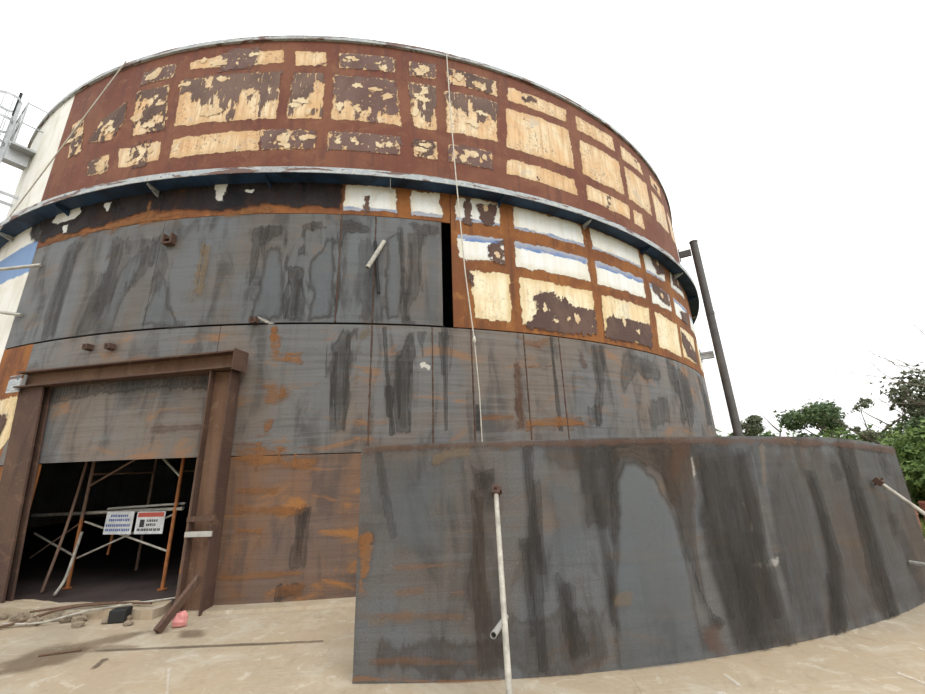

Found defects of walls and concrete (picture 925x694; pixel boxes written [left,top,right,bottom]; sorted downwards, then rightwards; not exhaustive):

peeling [65,46,283,169]
peeling [259,52,499,159]
peeling [463,196,497,226]
leakage [252,219,369,320]
leakage [382,327,413,434]
leakage [550,337,563,431]
peeling [525,291,653,349]
peeling [651,257,683,306]
peeling [681,311,698,363]
rust [358,533,373,591]
leakage [519,445,548,672]
leakage [589,442,792,651]